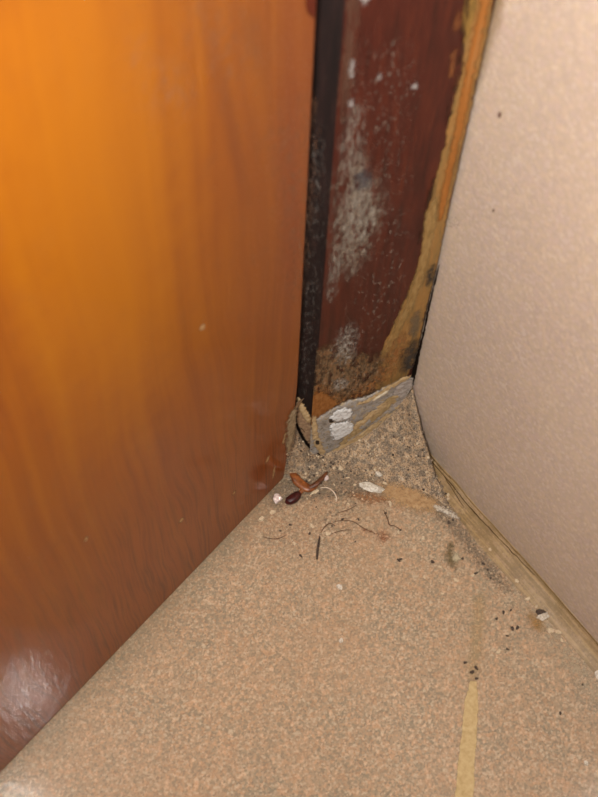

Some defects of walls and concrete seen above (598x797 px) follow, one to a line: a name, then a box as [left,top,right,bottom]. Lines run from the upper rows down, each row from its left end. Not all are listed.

damp [335,166,379,266]
peeling [374,0,493,390]
spalling [282,384,456,523]